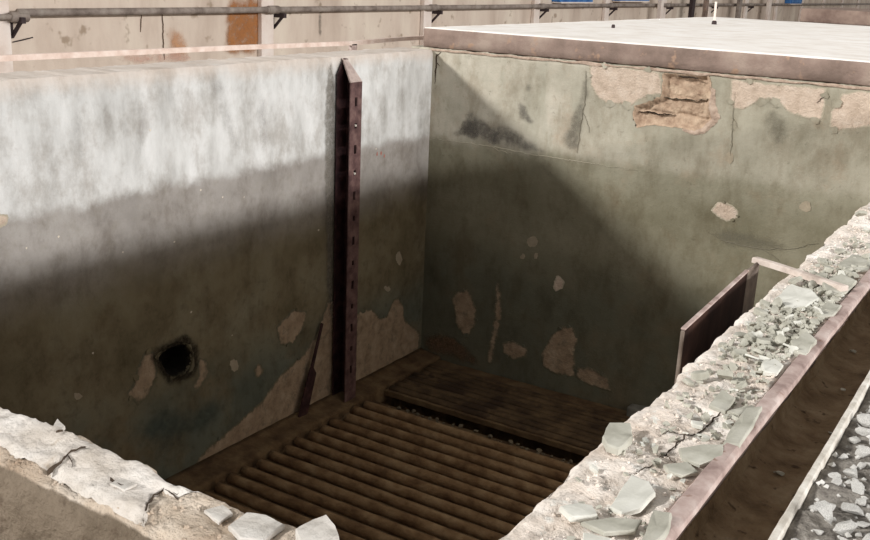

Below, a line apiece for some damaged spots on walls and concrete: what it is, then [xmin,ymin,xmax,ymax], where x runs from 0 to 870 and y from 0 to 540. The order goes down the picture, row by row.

corrosion [227,0,258,53]
damp [464,119,531,148]
crack [433,95,638,171]
flaking render [586,62,720,135]
peeling [727,79,870,134]
peeling [711,201,739,222]
peeling [193,300,333,464]
peeling [356,286,420,381]
peeling [541,325,612,392]
peeling [602,210,870,483]
crack [47,430,86,476]
crack [634,410,729,475]